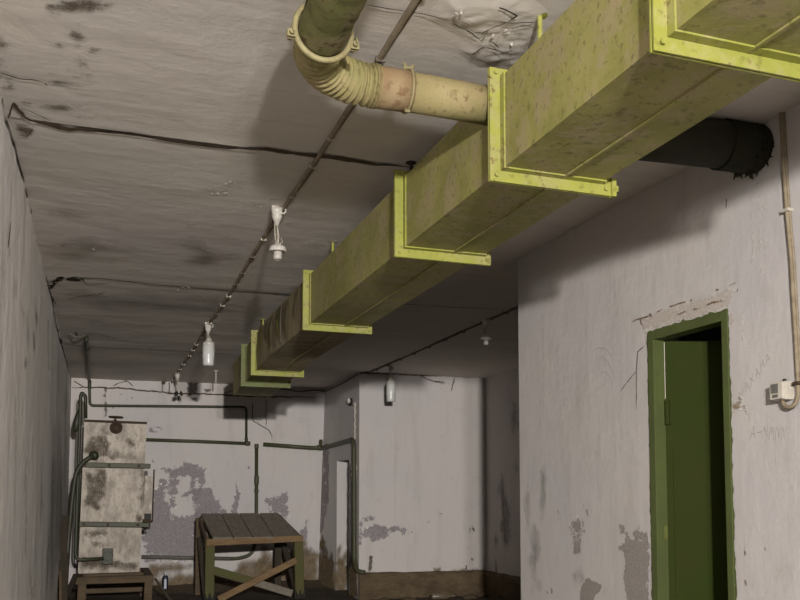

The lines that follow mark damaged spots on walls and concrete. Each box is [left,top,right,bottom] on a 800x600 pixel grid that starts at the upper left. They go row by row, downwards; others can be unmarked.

water stain [46,0,110,11]
crack [2,98,414,213]
crack [46,277,314,435]
peeling [141,461,241,563]
peeling [264,492,290,518]
peeling [320,449,329,533]
peeling [348,464,414,567]
peeling [569,505,590,557]
peeling [580,578,602,600]
peeling [617,524,651,600]